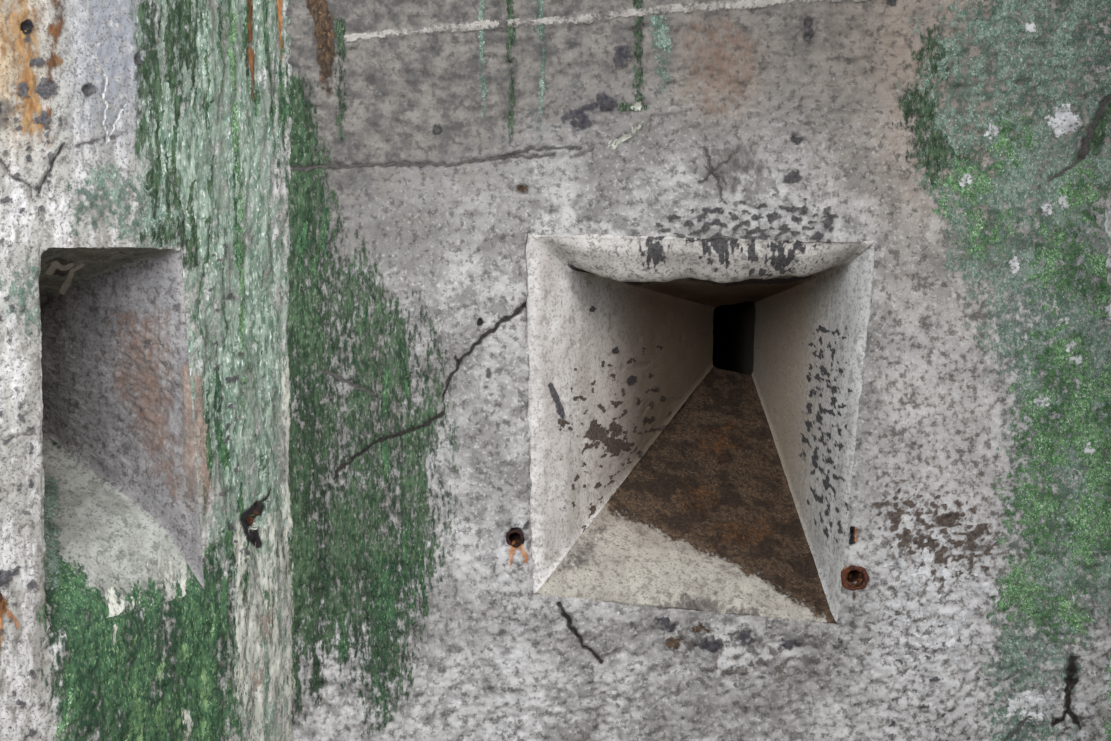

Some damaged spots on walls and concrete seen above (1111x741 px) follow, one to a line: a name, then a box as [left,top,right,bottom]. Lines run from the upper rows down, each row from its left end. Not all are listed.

rust [0,0,64,147]
crack [0,74,128,221]
leakage [130,0,443,741]
crack [322,370,375,398]
crack [333,301,527,479]
leakage [880,0,1111,741]
rust [0,598,18,646]
leakage [43,476,217,741]
rust [509,540,528,565]
crack [557,602,604,664]
crack [1004,656,1082,741]